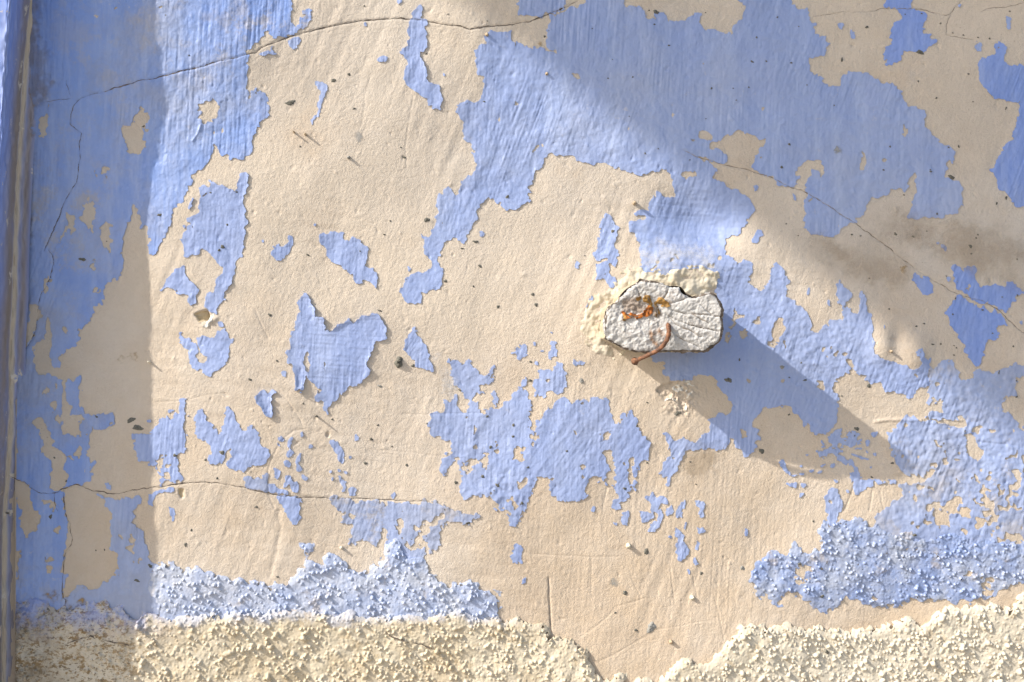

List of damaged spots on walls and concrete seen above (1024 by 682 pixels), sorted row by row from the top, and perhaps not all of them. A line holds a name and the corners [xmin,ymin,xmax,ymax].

peeling [310,81,328,125]
crack [27,3,573,347]
peeling [16,0,313,620]
peeling [281,293,387,415]
peeling [314,223,378,288]
corrosion [621,295,670,345]
peeling [329,0,1024,574]
crack [686,151,1023,333]
crack [10,476,421,605]